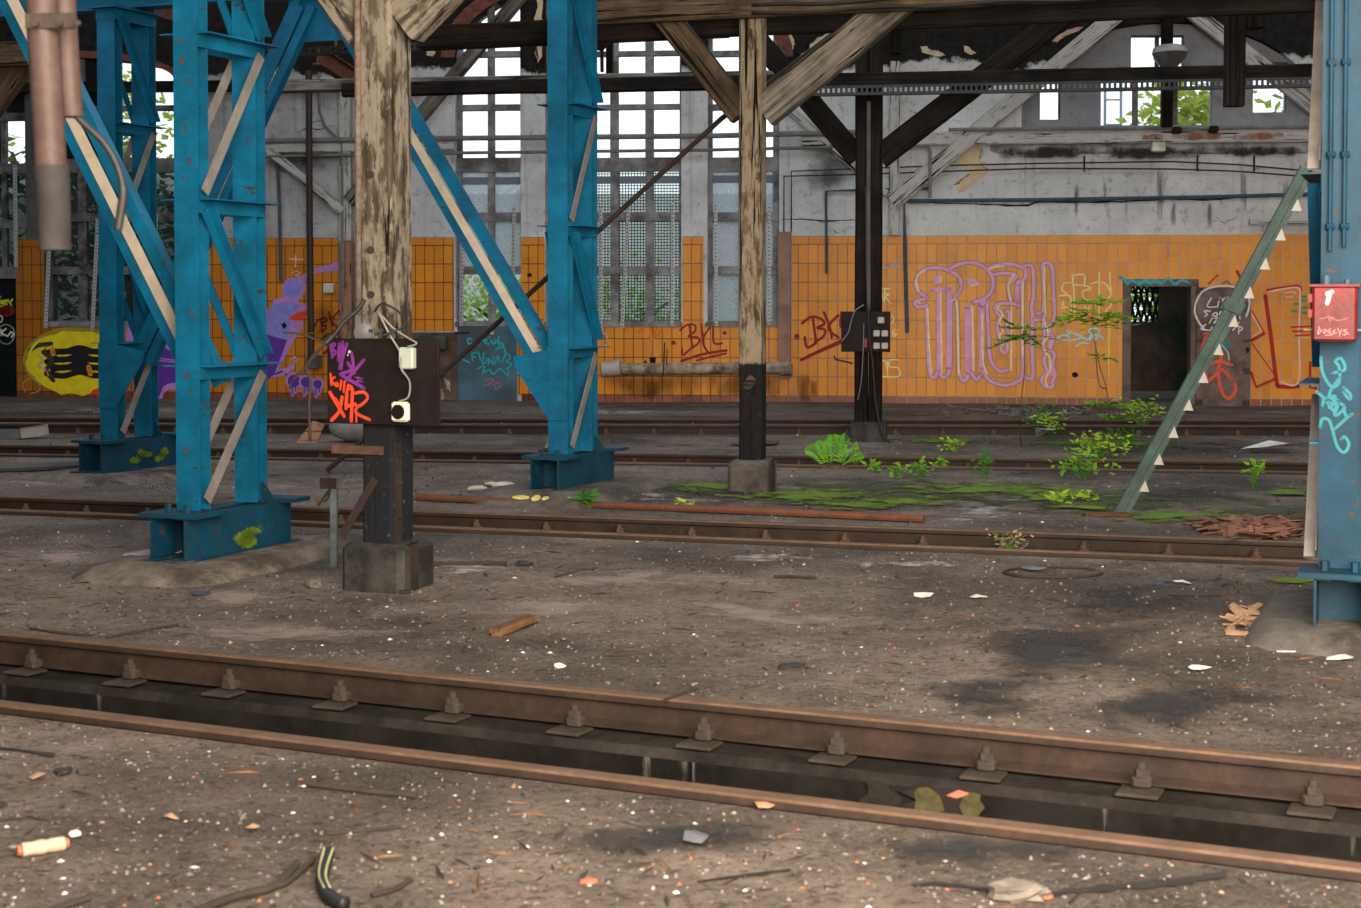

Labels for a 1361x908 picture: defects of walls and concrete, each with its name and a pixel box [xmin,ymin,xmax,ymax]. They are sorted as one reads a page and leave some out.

flaking render [954,145,987,193]